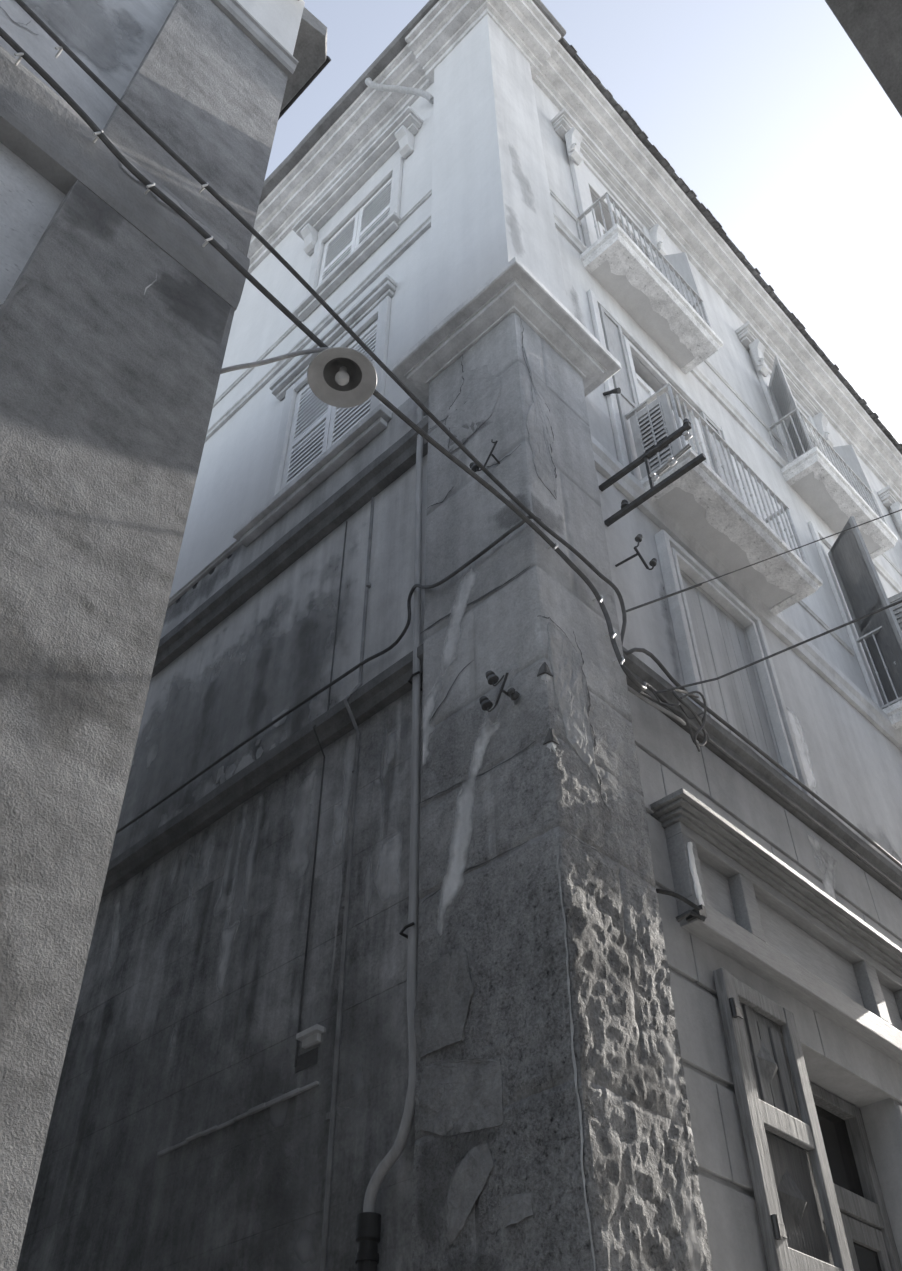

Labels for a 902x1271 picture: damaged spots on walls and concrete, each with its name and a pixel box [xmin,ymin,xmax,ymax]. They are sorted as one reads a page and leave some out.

damp [22,0,142,69]
damp [441,571,476,670]
damp [423,684,439,764]
damp [438,708,497,928]